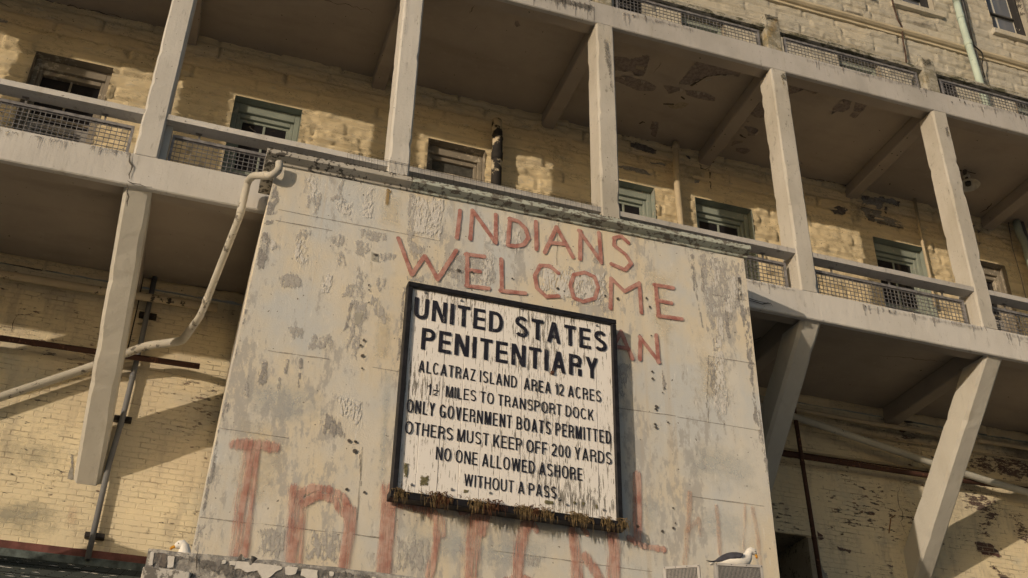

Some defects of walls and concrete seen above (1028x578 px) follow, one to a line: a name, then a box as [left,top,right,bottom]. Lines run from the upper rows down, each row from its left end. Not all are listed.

leakage [534,0,595,20]
peeling [614,55,740,101]
peeling [740,103,764,138]
crack [126,153,146,205]
peeling [831,195,904,229]
peeling [969,452,1028,481]
peeling [963,493,1028,578]
peeling [149,552,180,568]